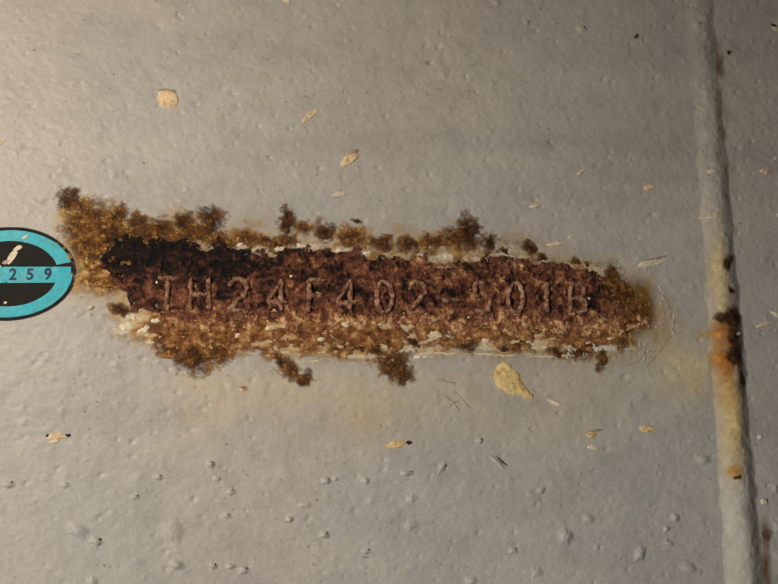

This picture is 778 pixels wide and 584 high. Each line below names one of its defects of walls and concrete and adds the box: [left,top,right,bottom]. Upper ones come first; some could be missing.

corrosion [56,187,677,386]
corrosion [701,244,745,479]